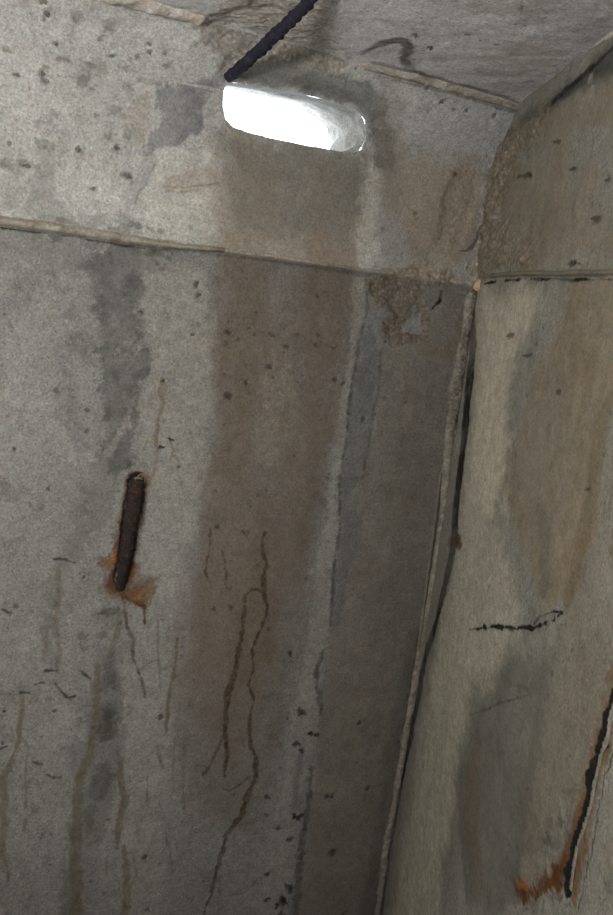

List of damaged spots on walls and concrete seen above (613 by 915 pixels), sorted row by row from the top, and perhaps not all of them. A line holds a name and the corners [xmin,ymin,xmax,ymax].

spalling [363,151,485,354]
damp [464,7,613,271]
corrosion [75,375,181,699]
damp [0,63,492,915]
damp [383,276,613,915]
crack [397,276,613,816]
crack [509,527,613,912]